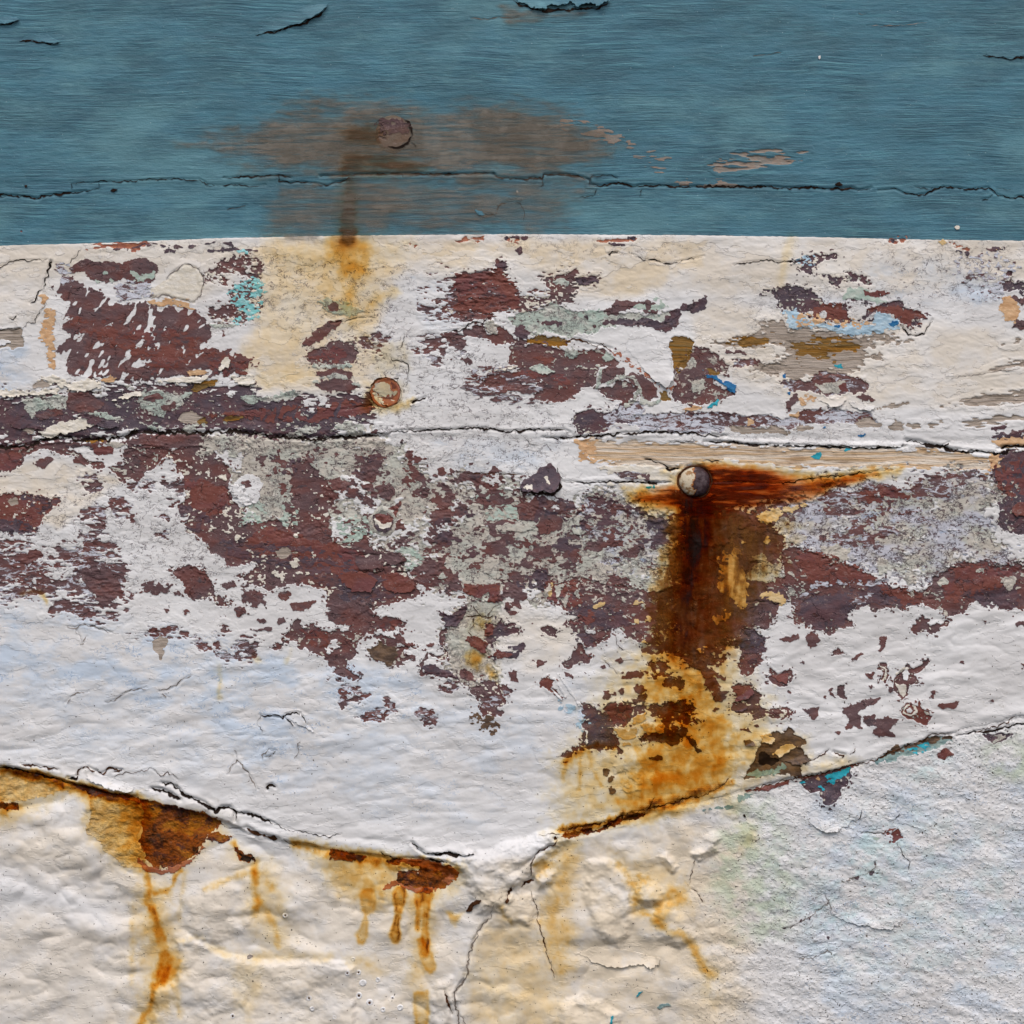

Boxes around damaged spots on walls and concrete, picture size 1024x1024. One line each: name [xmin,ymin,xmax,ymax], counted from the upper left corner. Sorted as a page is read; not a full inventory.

peeling [513,0,610,13]
damp [218,100,608,237]
crack [0,119,1024,210]
peeling [675,149,809,192]
peeling [504,235,528,255]
peeling [597,236,637,246]
crack [0,336,1024,485]
peeling [0,239,1024,833]
corrosion [645,465,854,649]
crack [0,764,336,846]
crack [381,843,474,863]
crack [445,716,1024,1024]